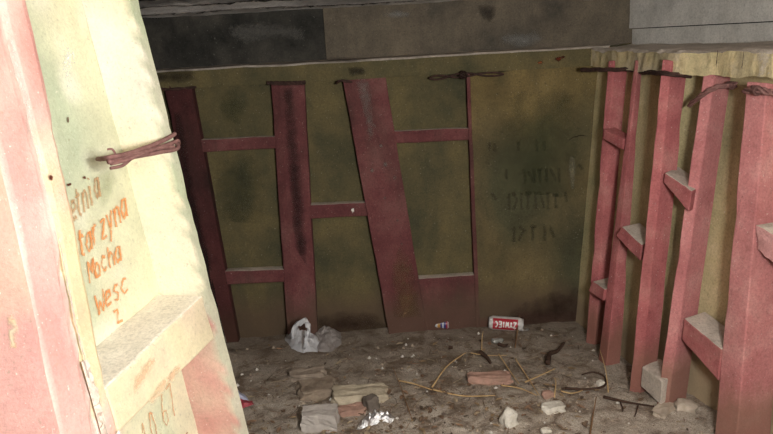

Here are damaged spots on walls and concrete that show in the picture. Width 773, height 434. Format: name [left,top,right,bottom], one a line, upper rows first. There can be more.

crack [245,0,416,9]